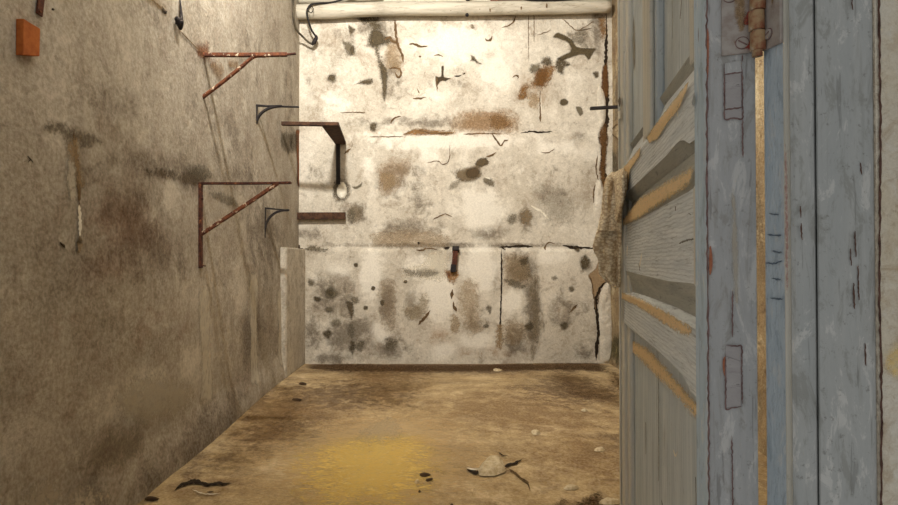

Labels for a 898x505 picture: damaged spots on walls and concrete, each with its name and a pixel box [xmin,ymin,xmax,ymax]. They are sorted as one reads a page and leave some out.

rust [519,63,556,107]
crack [502,13,618,202]
water stain [456,116,510,186]
water stain [308,254,619,387]
crack [496,227,598,350]
water stain [574,247,590,269]
crack [569,282,606,359]
flaking render [588,264,605,311]
water stain [254,413,477,505]